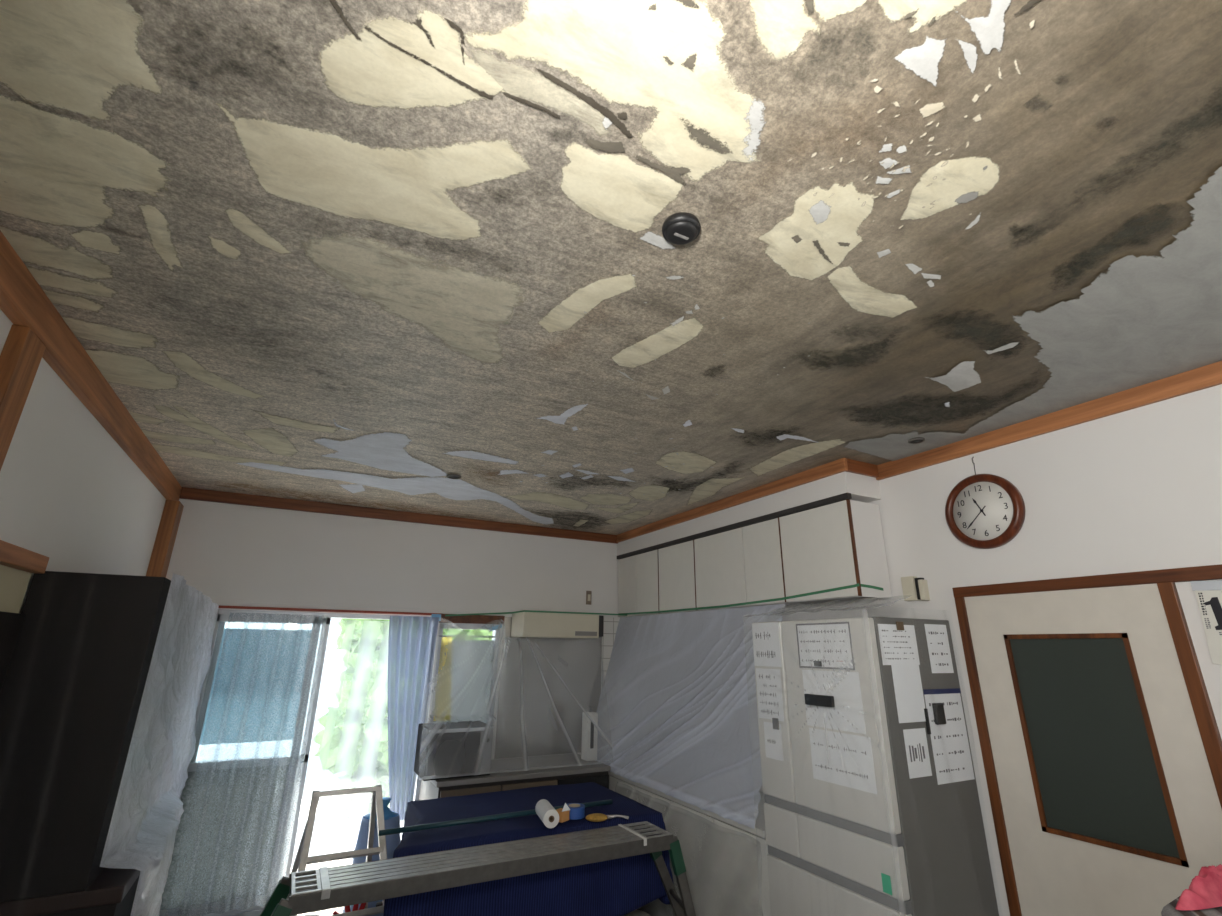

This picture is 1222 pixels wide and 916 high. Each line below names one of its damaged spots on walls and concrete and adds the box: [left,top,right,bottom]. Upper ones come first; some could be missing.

crack [329,0,632,137]
peeling [895,0,1011,85]
peeling [742,99,766,161]
peeling [858,100,969,206]
peeling [640,232,675,249]
damp [1053,204,1175,286]
damp [802,328,891,369]
damp [934,312,1022,356]
peeling [844,166,1222,461]
damp [851,382,1037,426]
peeling [235,419,645,525]
damp [660,466,736,491]